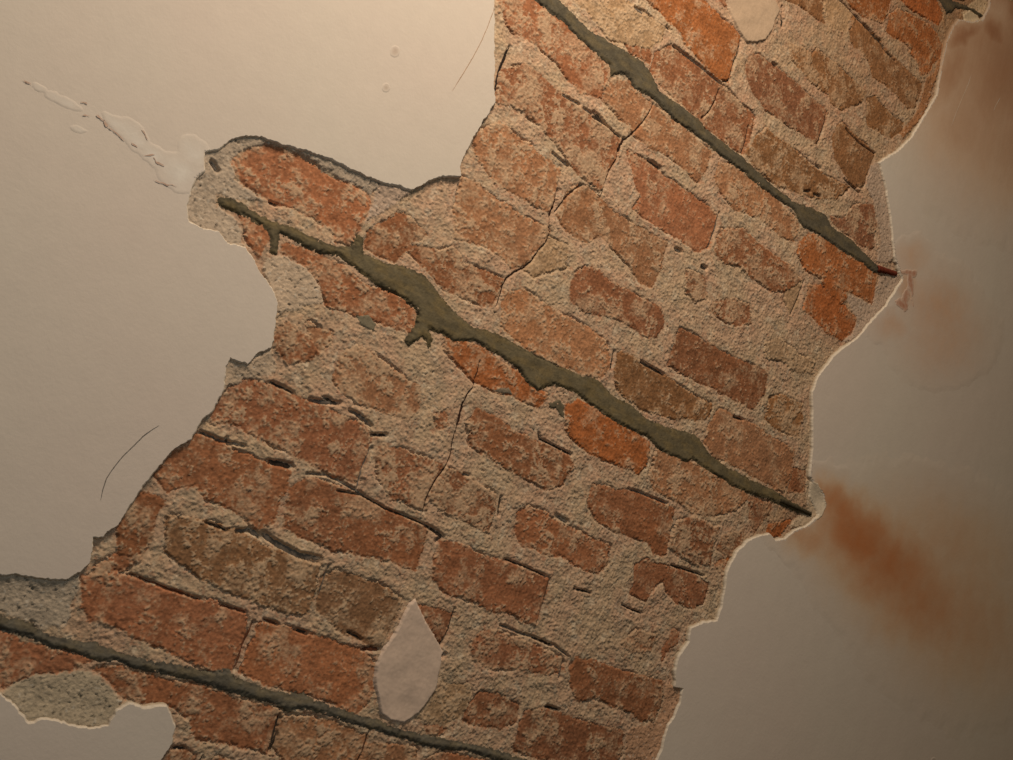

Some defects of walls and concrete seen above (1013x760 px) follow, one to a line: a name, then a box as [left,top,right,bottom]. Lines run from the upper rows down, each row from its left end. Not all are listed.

crack [497,106,652,303]
flaking render [375,443,497,534]
crack [422,361,480,512]
flaking render [587,448,772,570]
flaking render [0,491,253,672]
flaking render [0,619,492,760]
flaking render [163,514,404,651]
flaking render [430,538,549,626]
flaking render [469,628,566,677]
flaking render [568,655,665,723]
flaking render [629,557,709,609]
rust [760,451,1013,741]